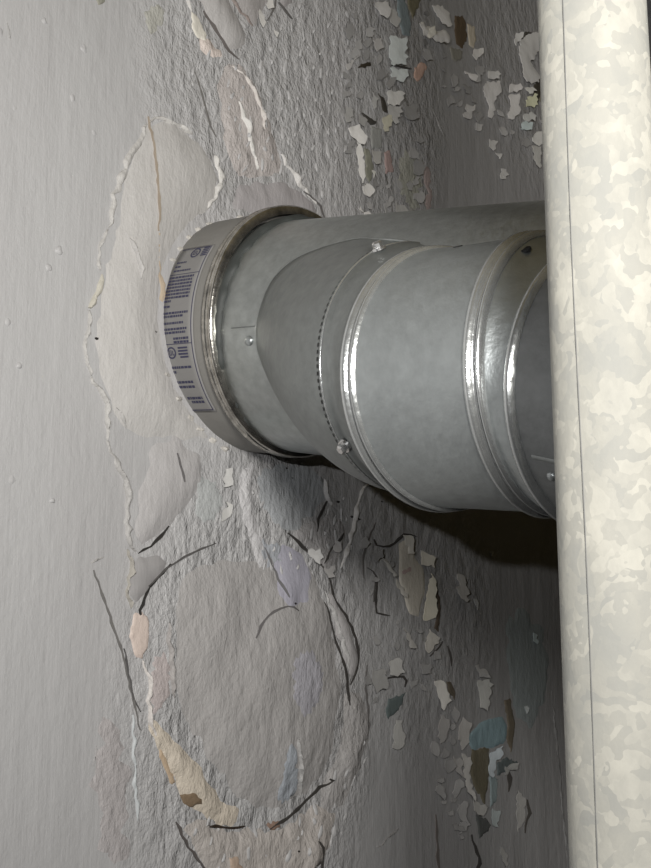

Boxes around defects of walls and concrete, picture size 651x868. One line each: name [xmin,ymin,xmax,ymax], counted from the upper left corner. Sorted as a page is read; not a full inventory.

peeling [344,114,381,214]
peeling [343,1,409,132]
peeling [407,0,484,62]
peeling [453,32,542,179]
crack [93,570,141,730]
crack [138,526,170,554]
crack [138,543,216,615]
crack [287,501,370,735]
peeling [382,535,441,660]
crack [209,822,245,830]
crack [270,780,335,829]
peeling [430,664,519,834]